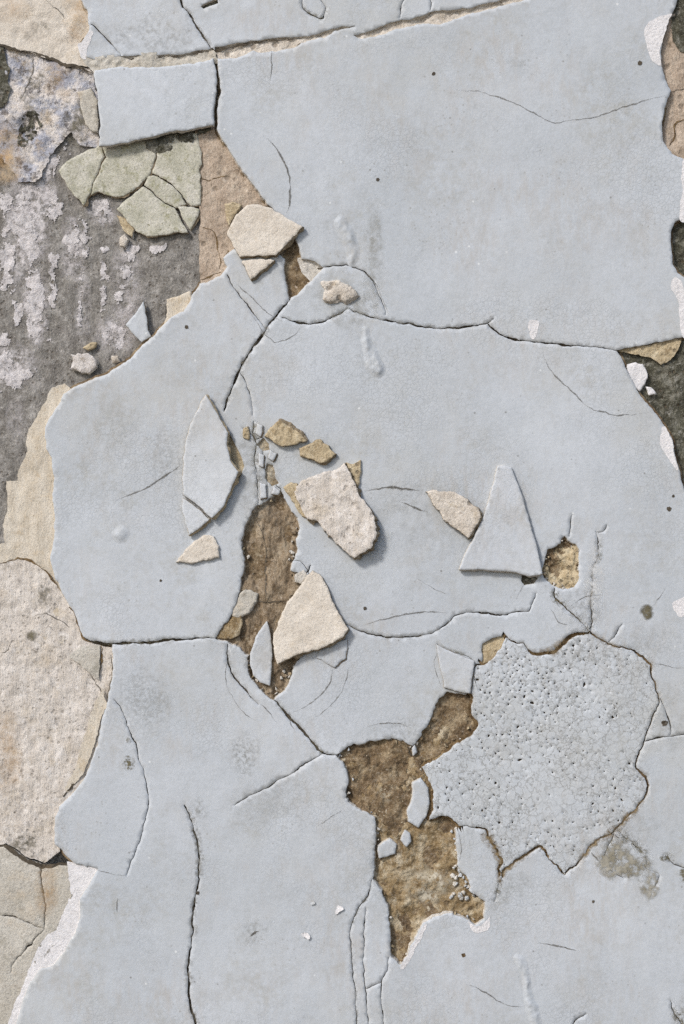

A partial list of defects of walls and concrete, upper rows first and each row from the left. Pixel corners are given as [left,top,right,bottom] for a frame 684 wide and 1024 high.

crack [46,0,294,73]
spalling [0,0,343,544]
crack [201,227,605,411]
peeling [618,0,684,481]
peeling [176,394,380,699]
peeling [425,465,579,589]
peeling [0,559,113,1024]
crack [3,557,347,874]
crack [184,805,200,1024]
crack [350,887,385,1024]
peeling [338,632,659,970]
crack [351,528,682,892]